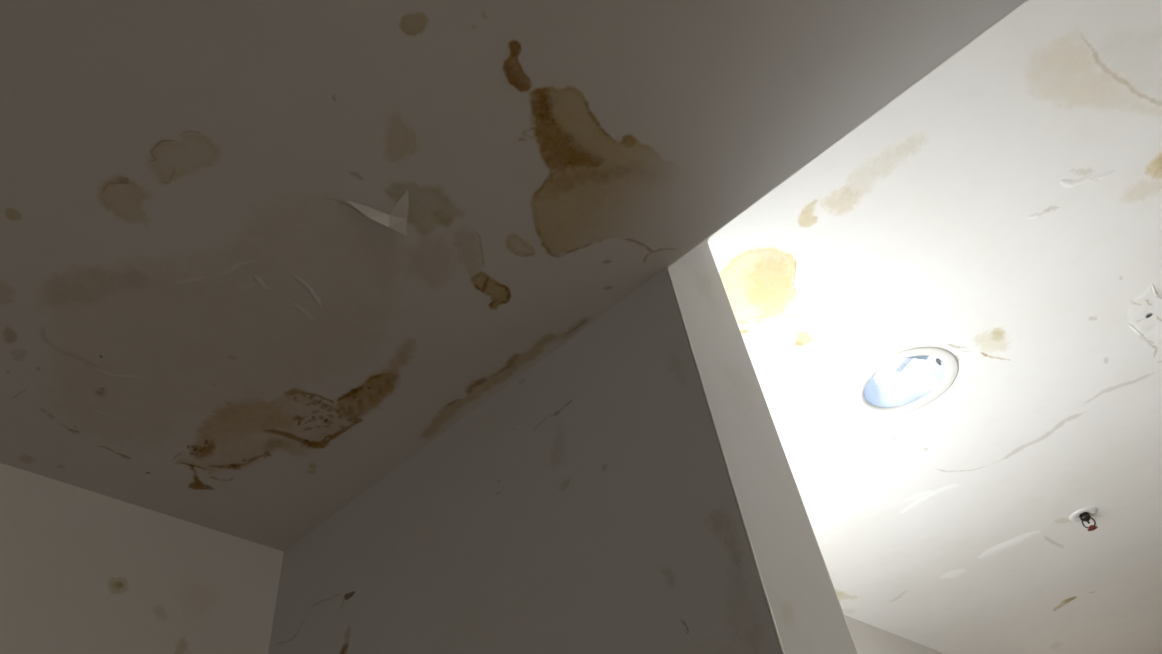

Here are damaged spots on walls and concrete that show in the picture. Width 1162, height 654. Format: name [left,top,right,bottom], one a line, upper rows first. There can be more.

peeling [346,190,409,235]